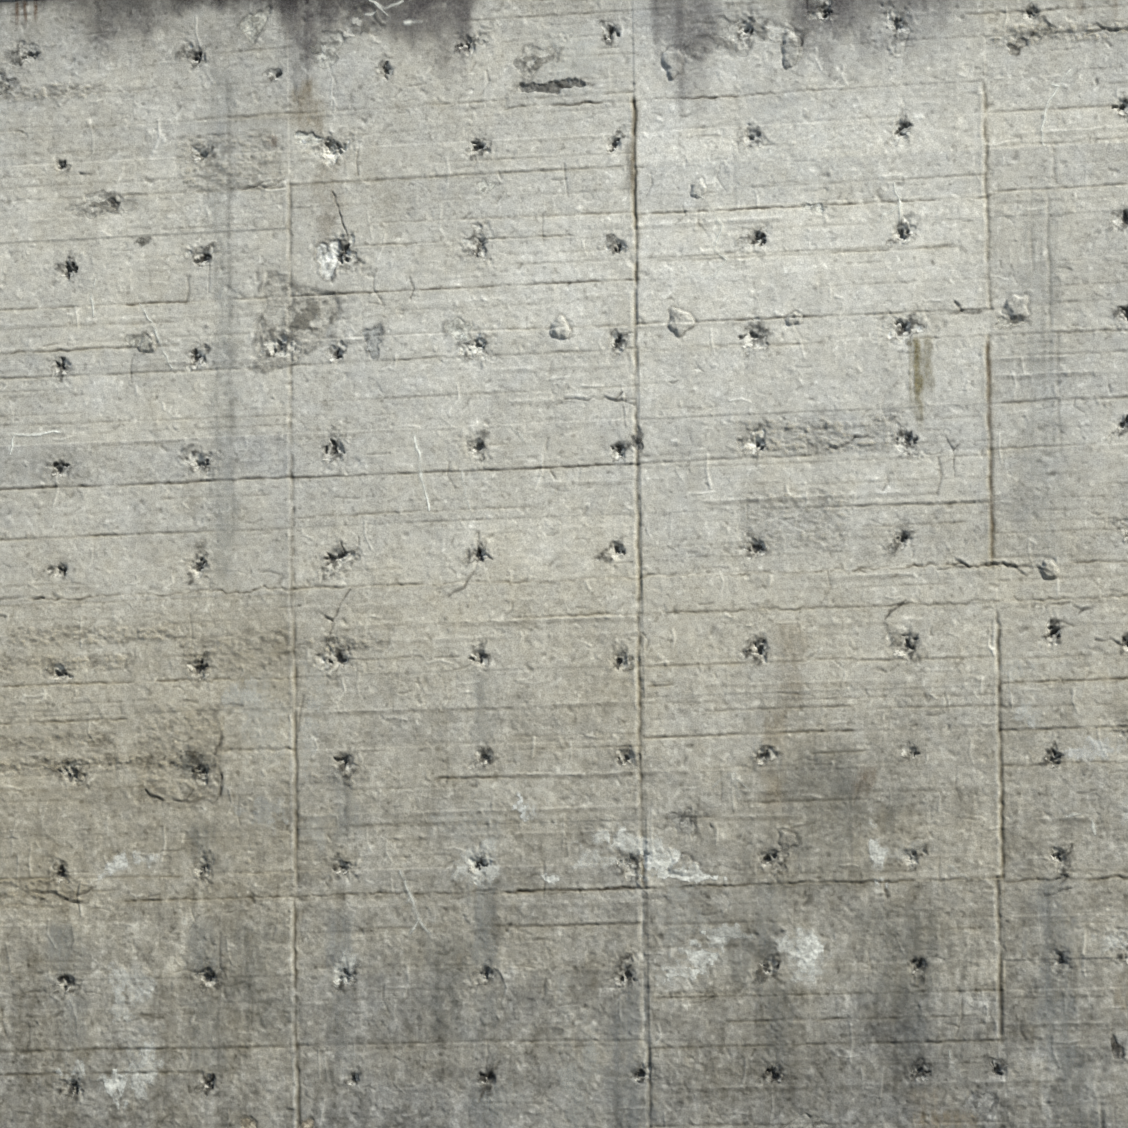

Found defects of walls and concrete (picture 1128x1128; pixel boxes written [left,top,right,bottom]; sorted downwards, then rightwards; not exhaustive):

water stain [269,0,472,53]
spalling [514,45,584,94]
spalling [317,241,354,279]
spalling [257,277,337,370]
rust [914,339,928,401]
water stain [457,844,499,955]
water stain [541,873,559,884]
water stain [580,827,727,895]
water stain [334,954,355,982]
water stain [662,924,752,981]
water stain [775,928,824,981]
water stain [100,1042,161,1109]